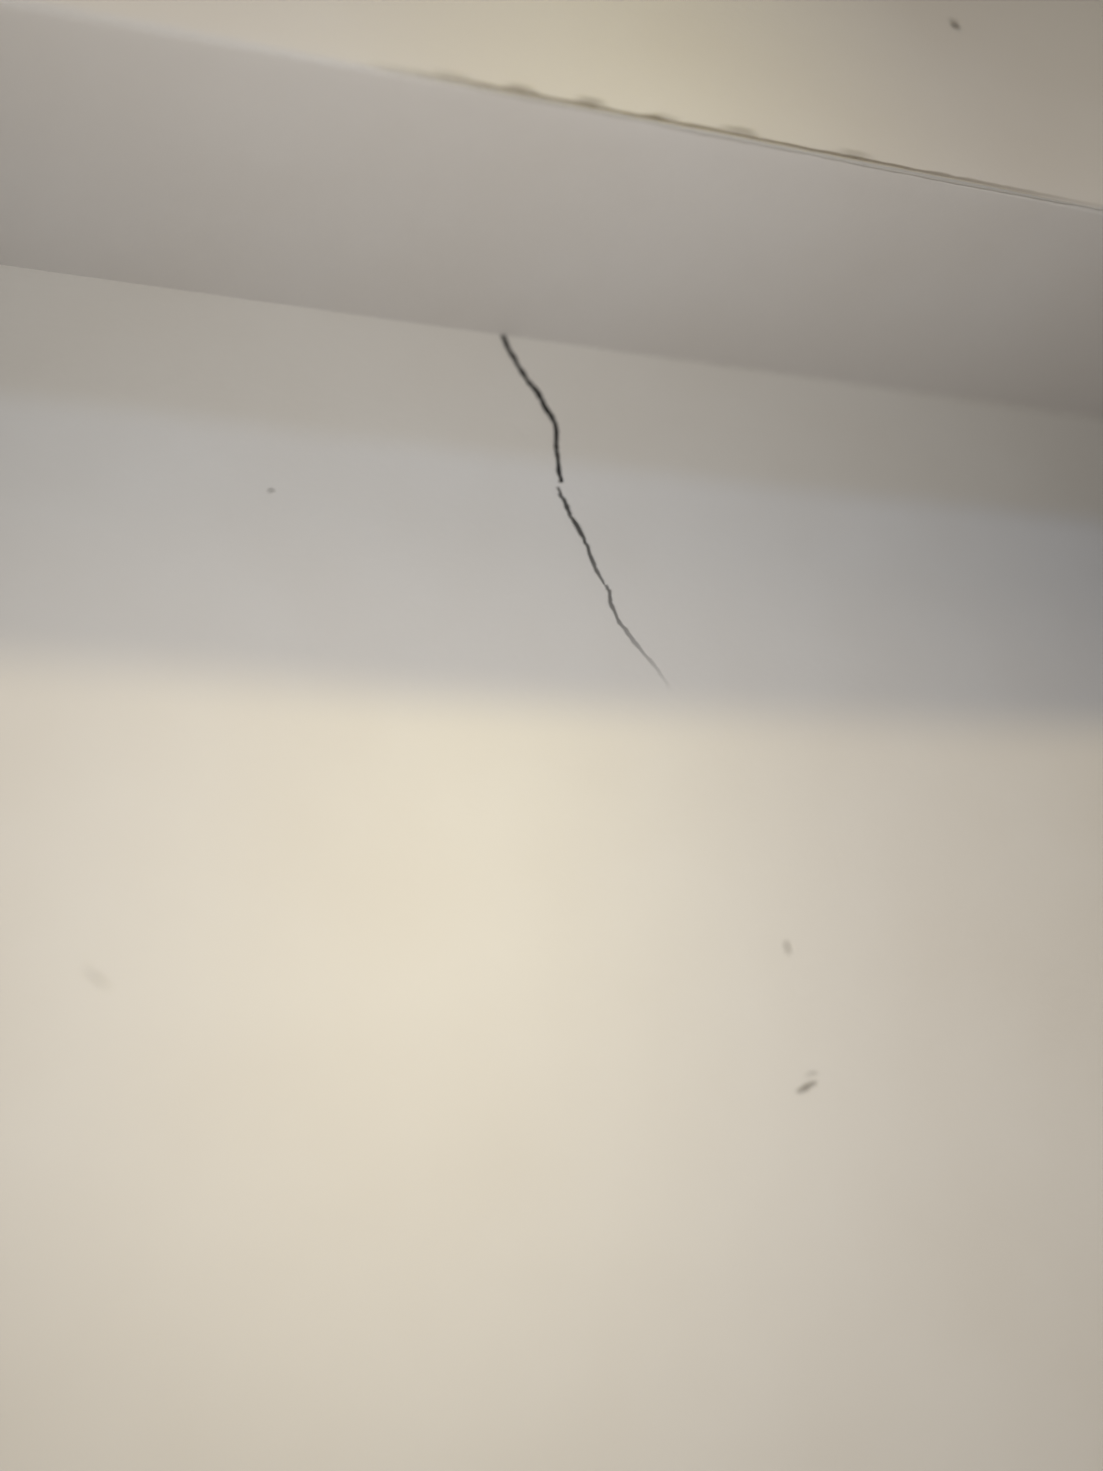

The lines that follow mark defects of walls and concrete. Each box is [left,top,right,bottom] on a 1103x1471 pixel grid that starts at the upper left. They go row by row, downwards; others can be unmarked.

crack [501,335,600,575]